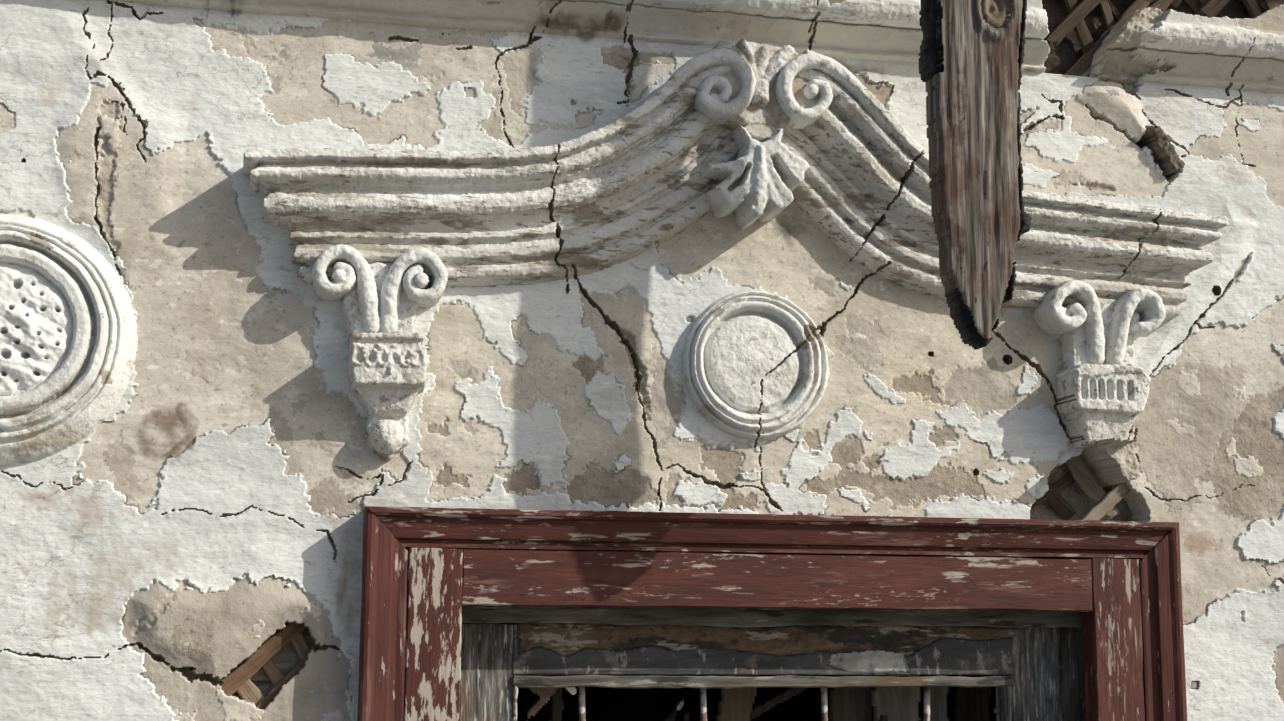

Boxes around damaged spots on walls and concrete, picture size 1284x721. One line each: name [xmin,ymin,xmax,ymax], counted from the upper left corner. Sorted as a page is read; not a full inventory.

crack [83,0,164,275]
peeling [193,17,602,149]
peeling [855,72,895,109]
crack [1021,94,1065,134]
spalling [1082,7,1172,94]
crack [1120,37,1256,167]
spalling [0,263,73,396]
peeling [55,82,1284,625]
crack [548,144,924,511]
crack [161,504,337,562]
crack [0,642,224,686]
peeling [121,574,352,721]